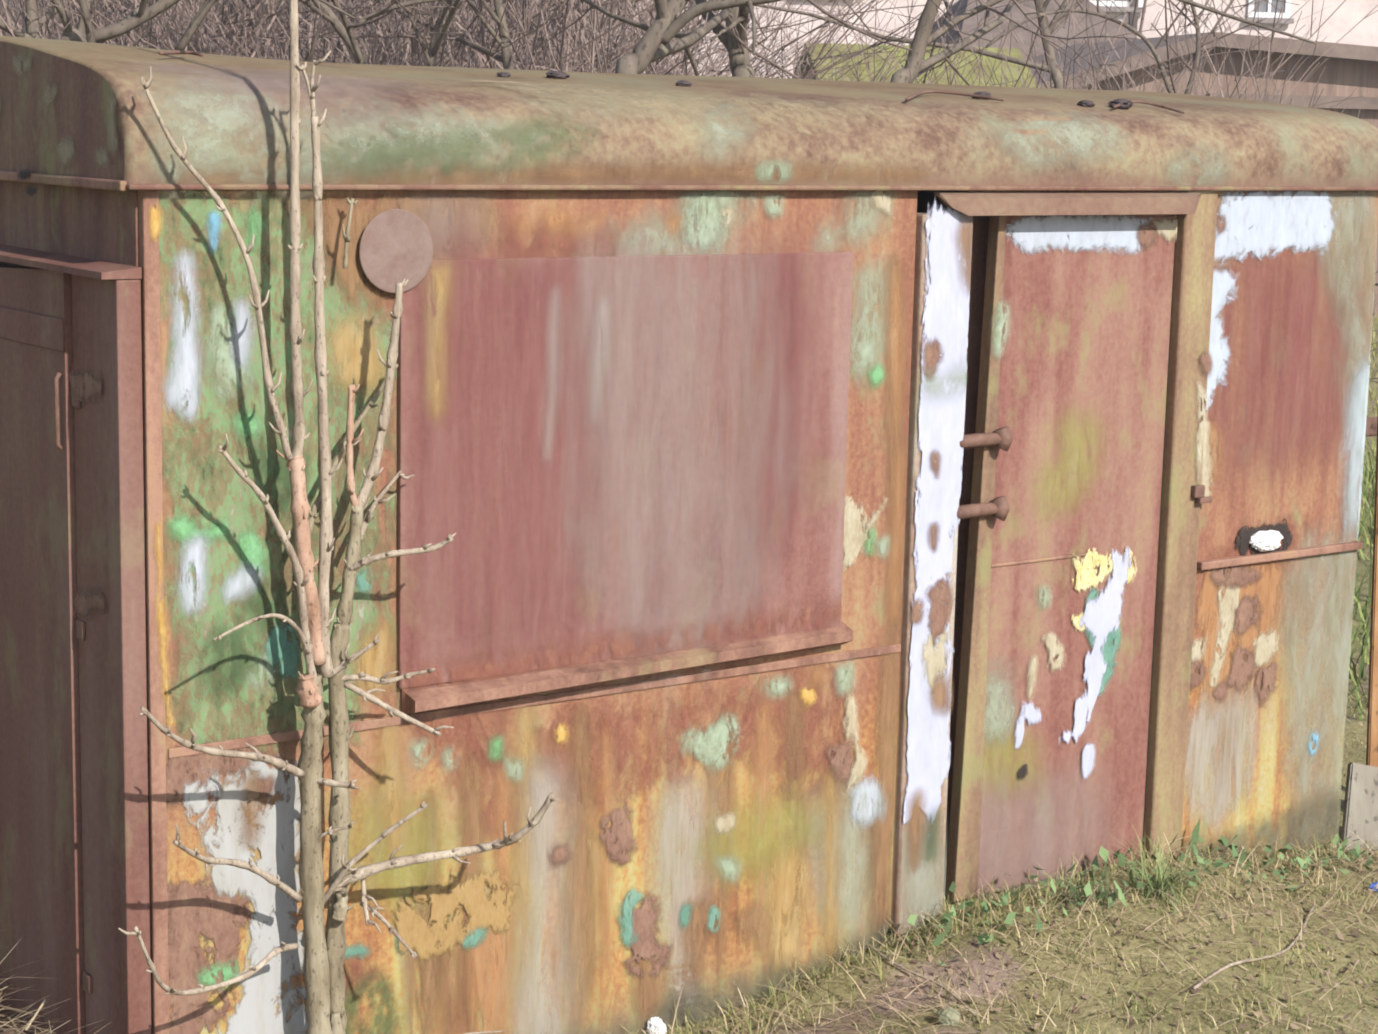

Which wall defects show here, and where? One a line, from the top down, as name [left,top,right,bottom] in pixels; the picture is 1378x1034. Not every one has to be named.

rust [1137,224,1157,248]
peeling [1153,219,1178,241]
rust [1216,216,1226,233]
rust [1214,258,1231,271]
rust [1200,352,1212,374]
rust [1190,519,1299,771]
peeling [1063,548,1137,778]
peeling [1015,633,1064,748]
peeling [184,760,308,1034]